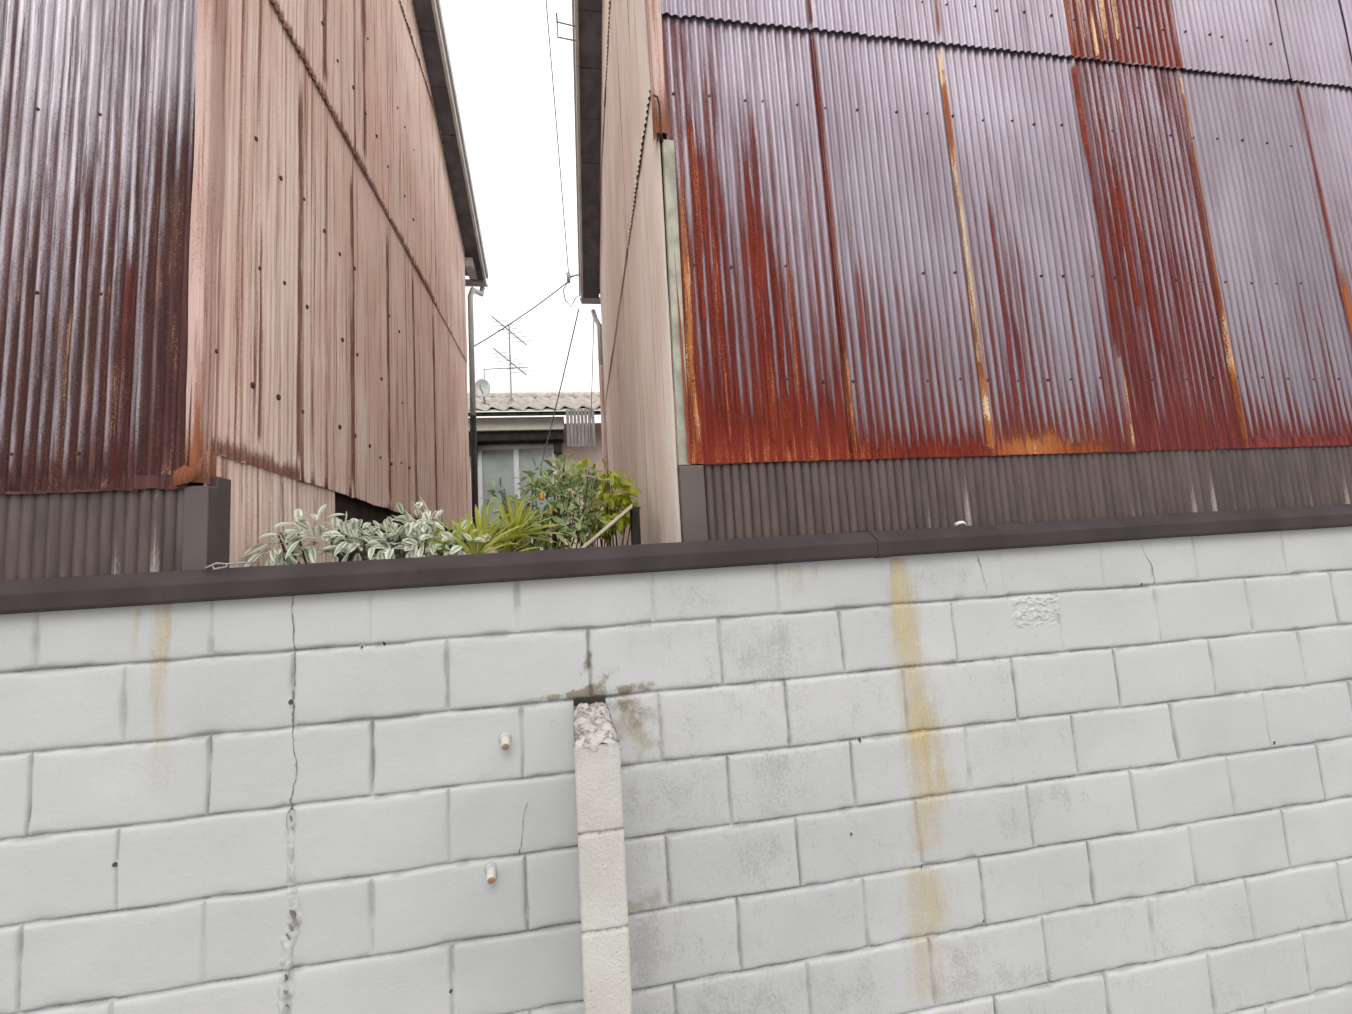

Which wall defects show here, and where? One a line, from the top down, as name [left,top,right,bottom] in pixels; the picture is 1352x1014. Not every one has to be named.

rust [0,95,195,479]
rust [662,19,1108,464]
rust [1065,0,1352,451]
crack [286,599,297,833]
peeling [1010,594,1061,632]